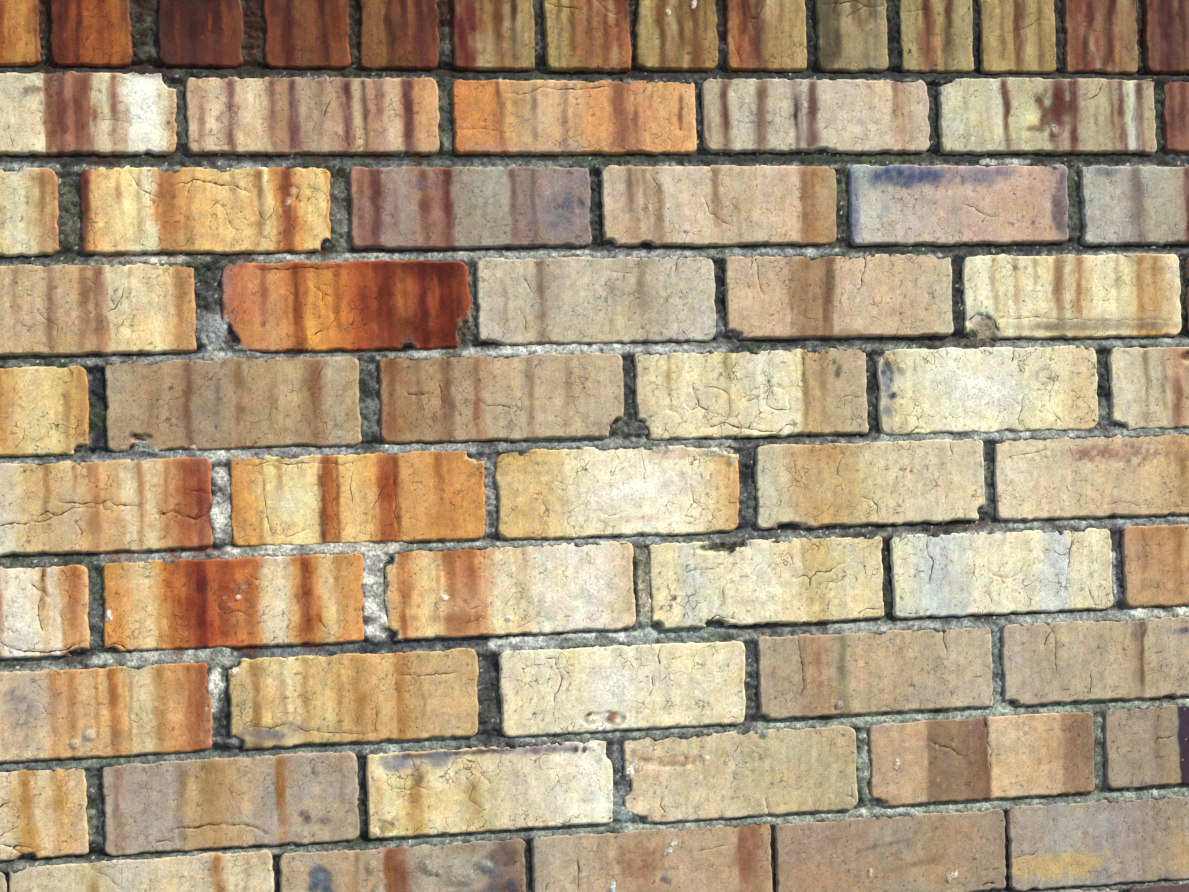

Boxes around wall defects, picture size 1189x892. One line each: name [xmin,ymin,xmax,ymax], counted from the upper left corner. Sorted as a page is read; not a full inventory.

rust [1002,81,1010,126]
rust [1028,81,1077,142]
rust [379,262,461,341]
crack [672,357,805,432]
crack [1,570,81,653]
crack [687,553,837,621]